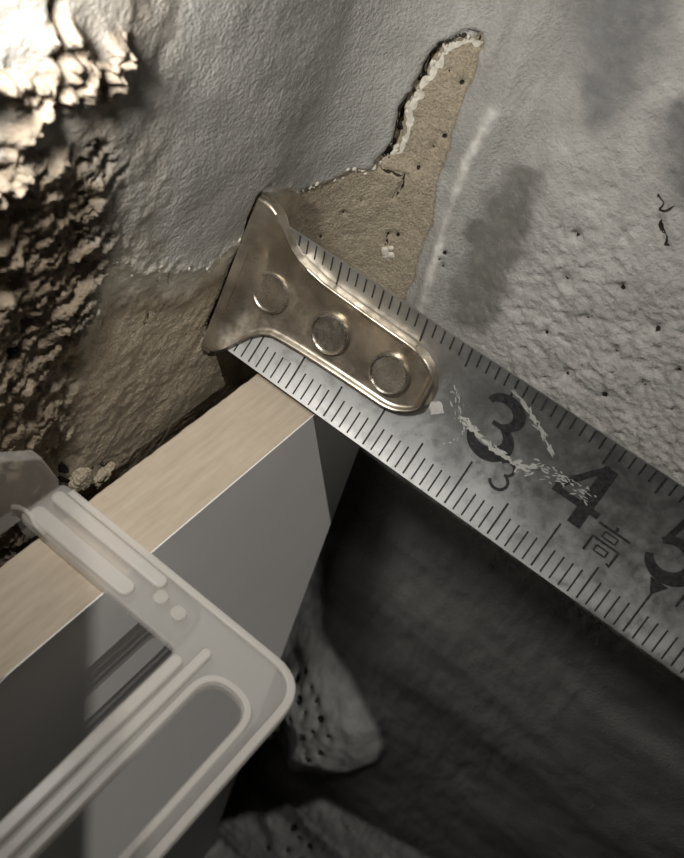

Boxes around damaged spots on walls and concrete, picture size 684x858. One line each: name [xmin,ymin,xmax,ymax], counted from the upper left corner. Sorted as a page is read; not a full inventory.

flaking render [292,33,484,302]
flaking render [63,269,241,499]